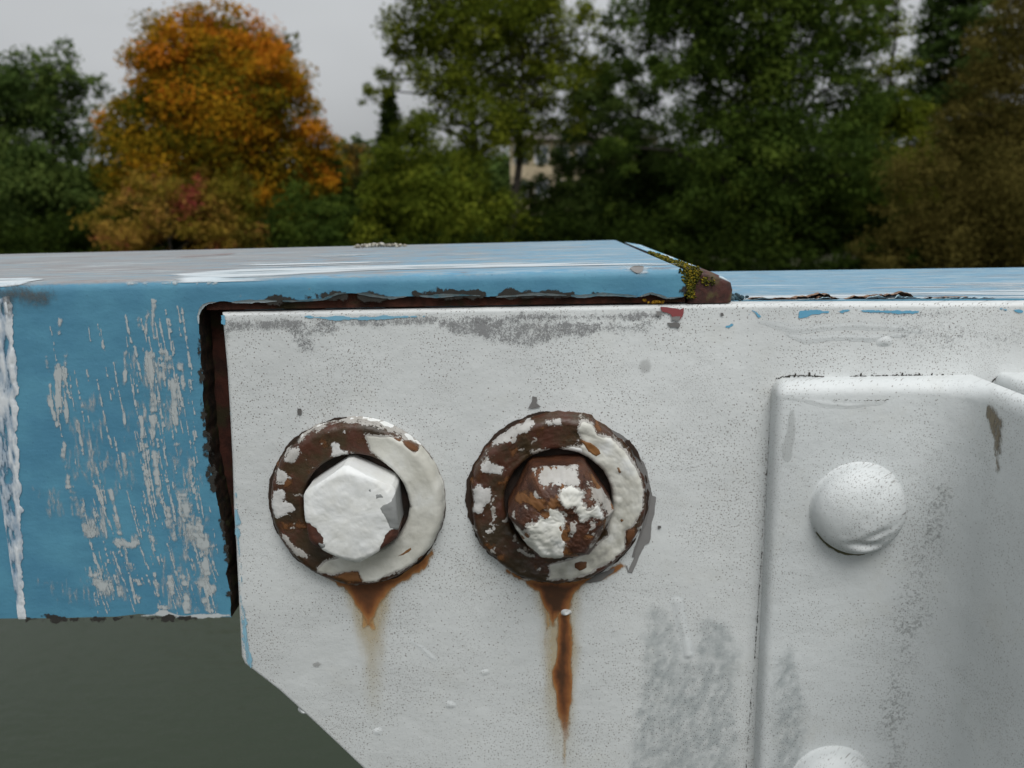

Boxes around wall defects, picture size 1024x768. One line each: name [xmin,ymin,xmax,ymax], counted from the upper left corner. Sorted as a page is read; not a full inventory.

peeling [200,404,218,493]
corrosion [211,309,244,521]
spalling [25,610,230,624]
corrosion [331,551,433,638]
corrosion [506,564,623,730]